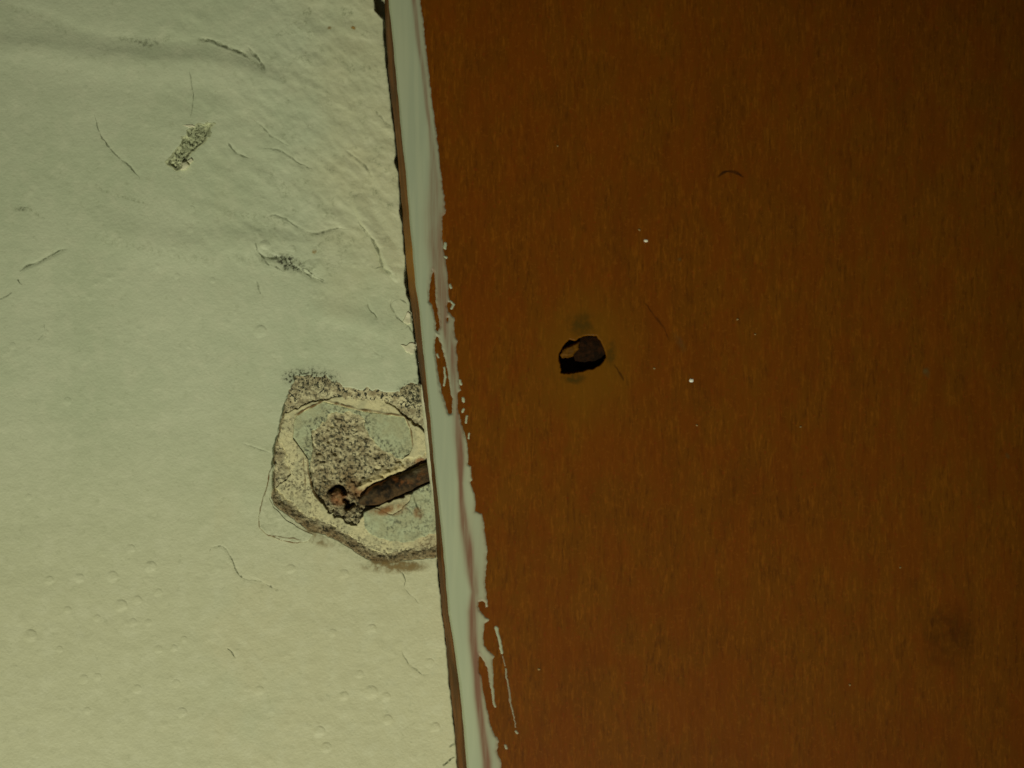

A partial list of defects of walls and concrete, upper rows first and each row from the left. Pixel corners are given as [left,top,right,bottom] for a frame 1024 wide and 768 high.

spalling [165,121,216,172]
spalling [258,374,437,564]
corrosion [359,462,430,514]